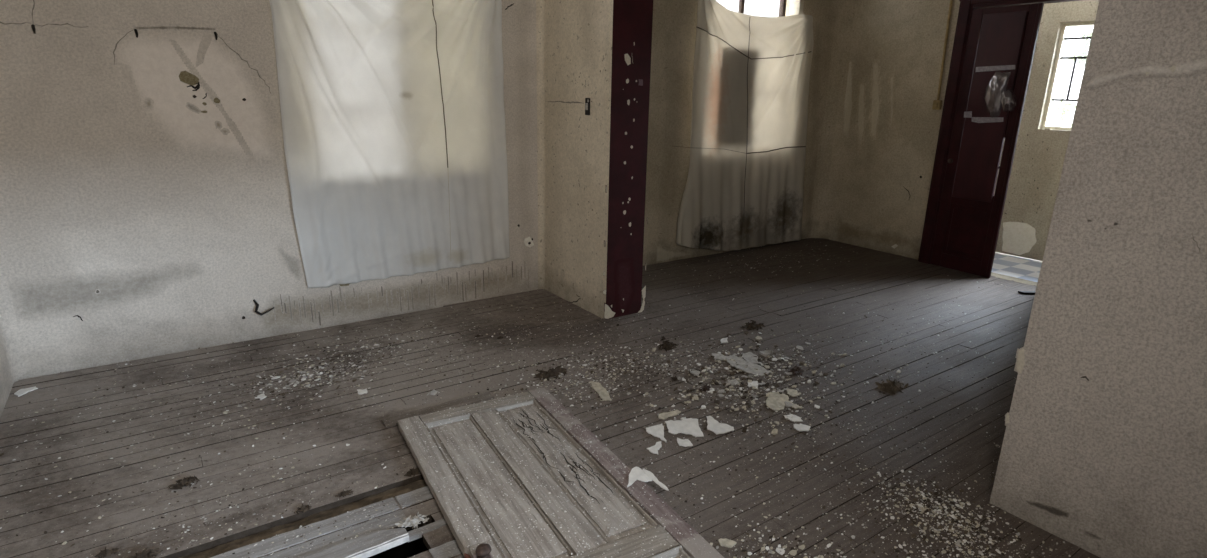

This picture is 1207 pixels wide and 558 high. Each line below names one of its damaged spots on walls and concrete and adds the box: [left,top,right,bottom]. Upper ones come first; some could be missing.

crack [0,0,89,28]
crack [216,32,271,93]
peeling [623,42,637,179]